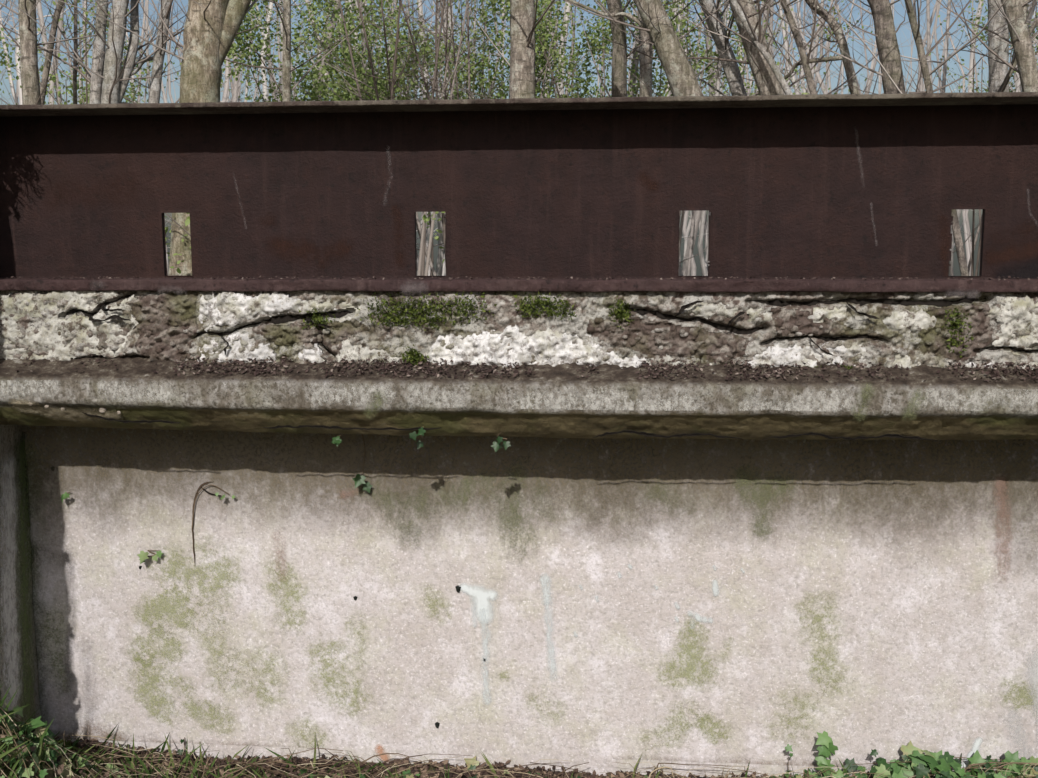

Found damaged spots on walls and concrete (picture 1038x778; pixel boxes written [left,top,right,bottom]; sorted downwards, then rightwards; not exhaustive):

damp [996,260,1038,279]
crack [64,292,136,322]
peeling [0,291,412,364]
crack [194,311,352,356]
peeling [426,295,1038,370]
crack [630,297,986,356]
crack [975,345,1038,353]
crack [82,412,181,424]
damp [0,425,1038,717]